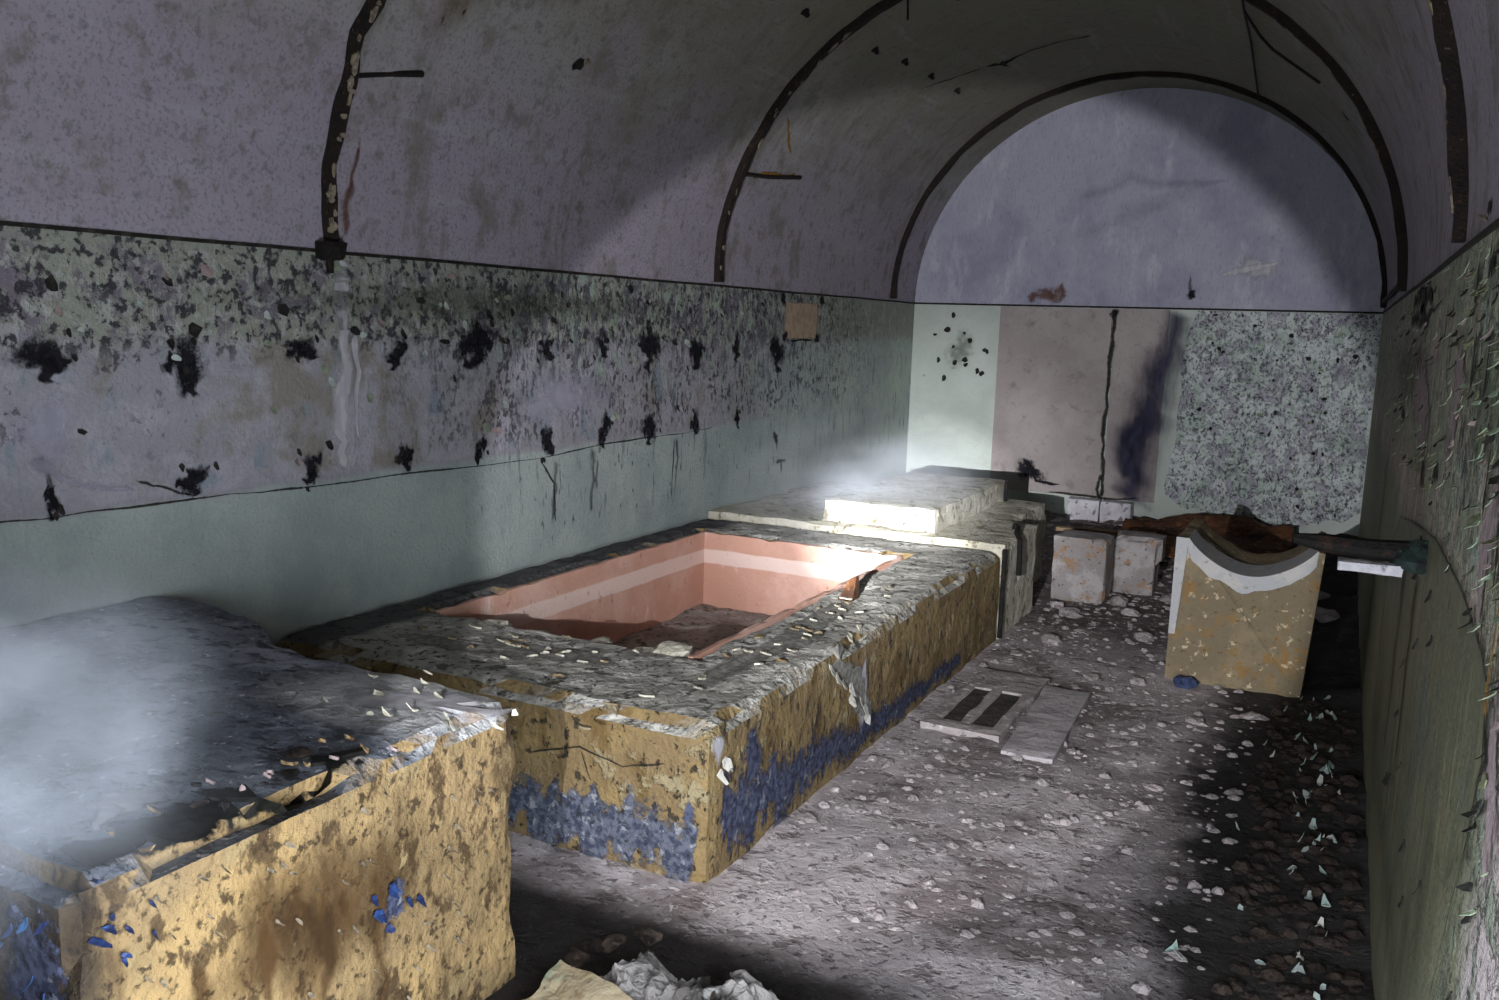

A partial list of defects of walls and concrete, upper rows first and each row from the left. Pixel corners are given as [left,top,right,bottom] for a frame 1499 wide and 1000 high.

peeling [44,274,86,362]
peeling [166,322,203,361]
peeling [264,304,290,320]
leakage [298,350,319,360]
leakage [333,260,362,468]
peeling [350,297,449,358]
peeling [422,320,467,357]
peeling [486,294,515,344]
peeling [638,302,706,347]
peeling [53,504,66,521]
spalling [684,597,872,725]
spalling [714,737,733,785]